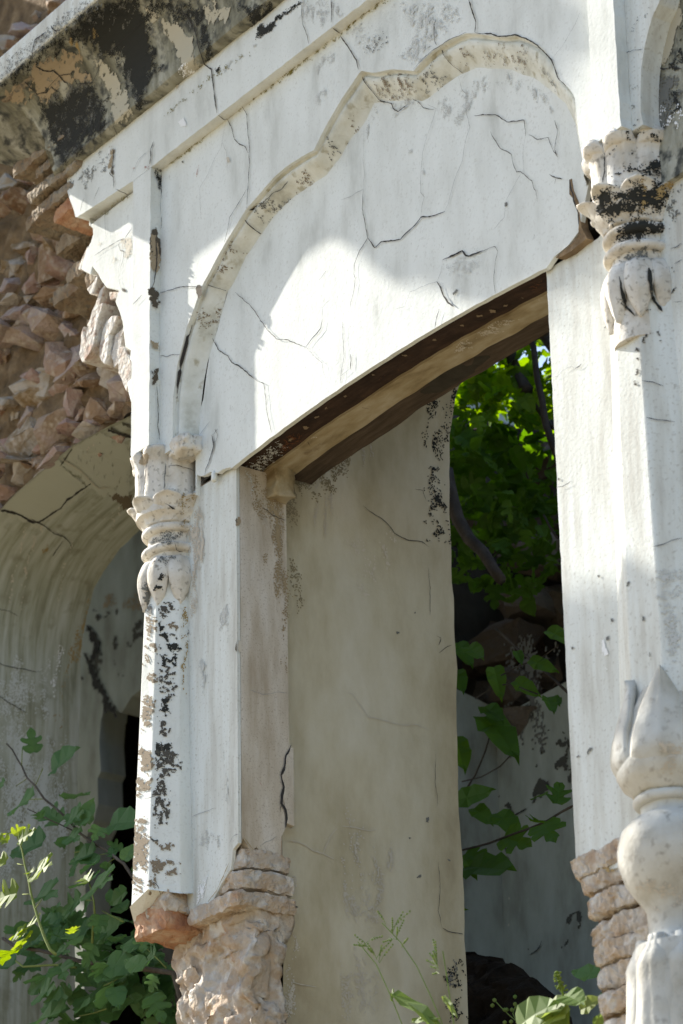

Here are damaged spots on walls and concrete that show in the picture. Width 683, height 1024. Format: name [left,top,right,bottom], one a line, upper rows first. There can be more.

leakage [0,0,238,192]
crack [80,1,580,383]
crack [157,327,271,439]
crack [1,483,91,555]
mould [421,388,457,544]
crack [260,746,291,845]